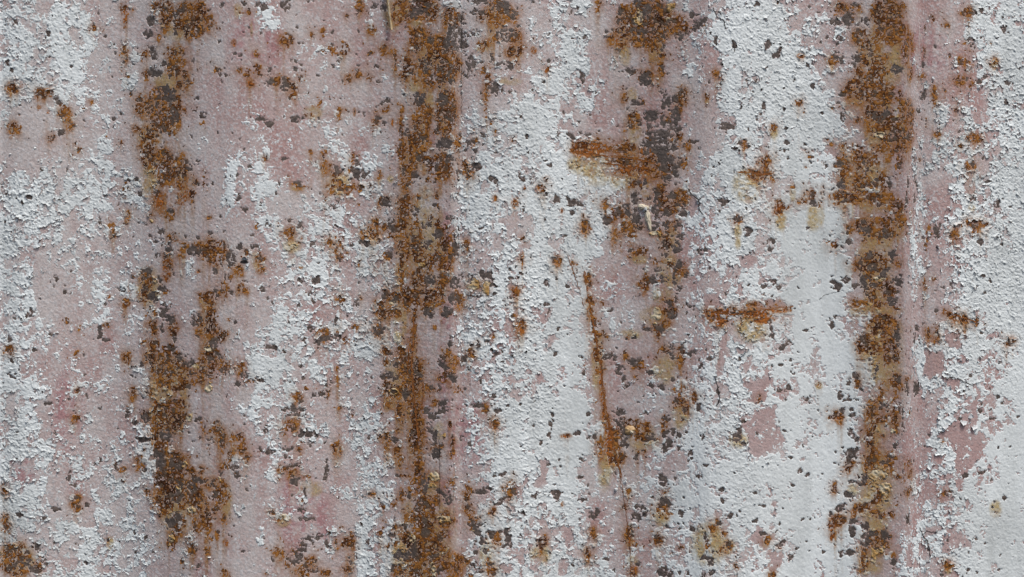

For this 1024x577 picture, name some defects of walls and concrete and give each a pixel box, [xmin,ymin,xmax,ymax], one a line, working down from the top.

peeling [1,327,96,488]
peeling [0,157,106,300]
rust [35,88,95,154]
rust [98,0,307,577]
peeling [238,344,339,577]
rust [278,0,537,577]
peeling [522,458,600,576]
rust [594,0,712,75]
rust [557,111,796,476]
peeling [602,326,811,577]
rust [733,0,1003,575]
peeling [905,329,1002,577]